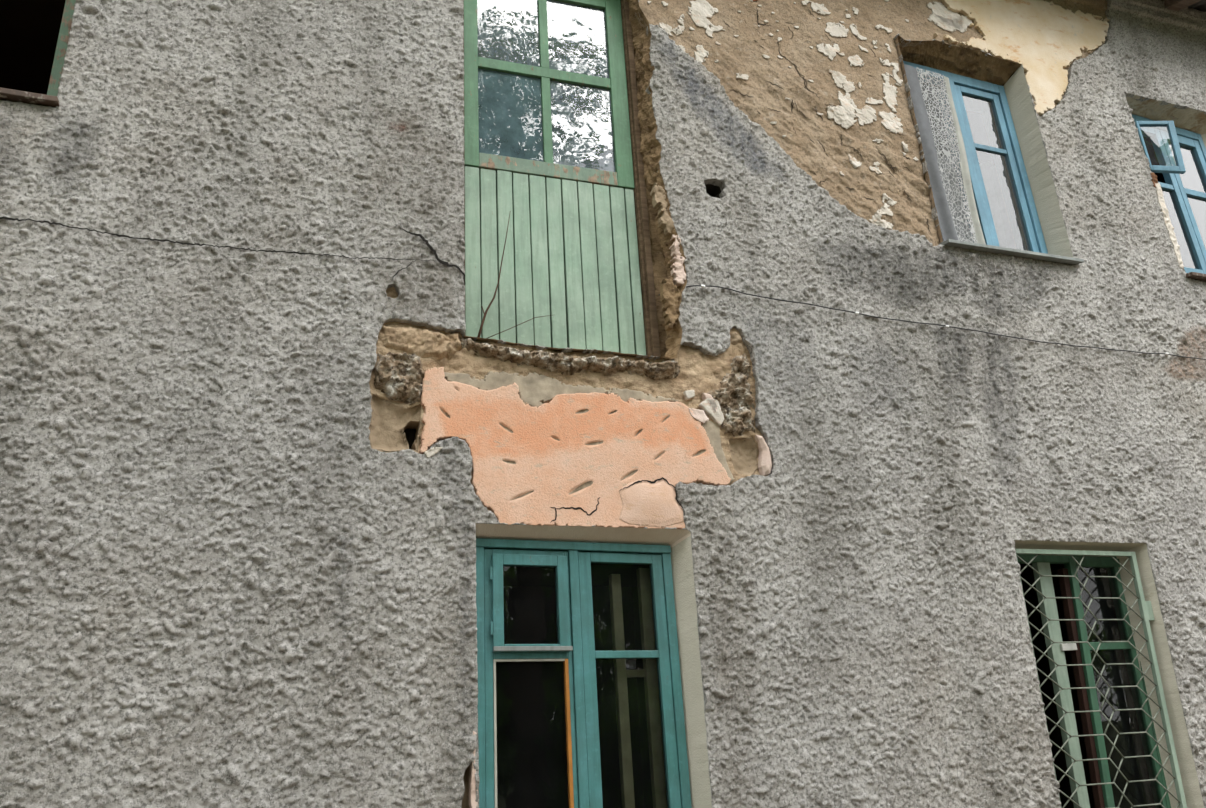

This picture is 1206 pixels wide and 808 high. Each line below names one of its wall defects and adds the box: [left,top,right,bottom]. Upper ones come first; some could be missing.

flaking render [635,0,1109,246]
crack [0,216,465,285]
flaking render [386,287,398,299]
flaking render [369,321,772,529]